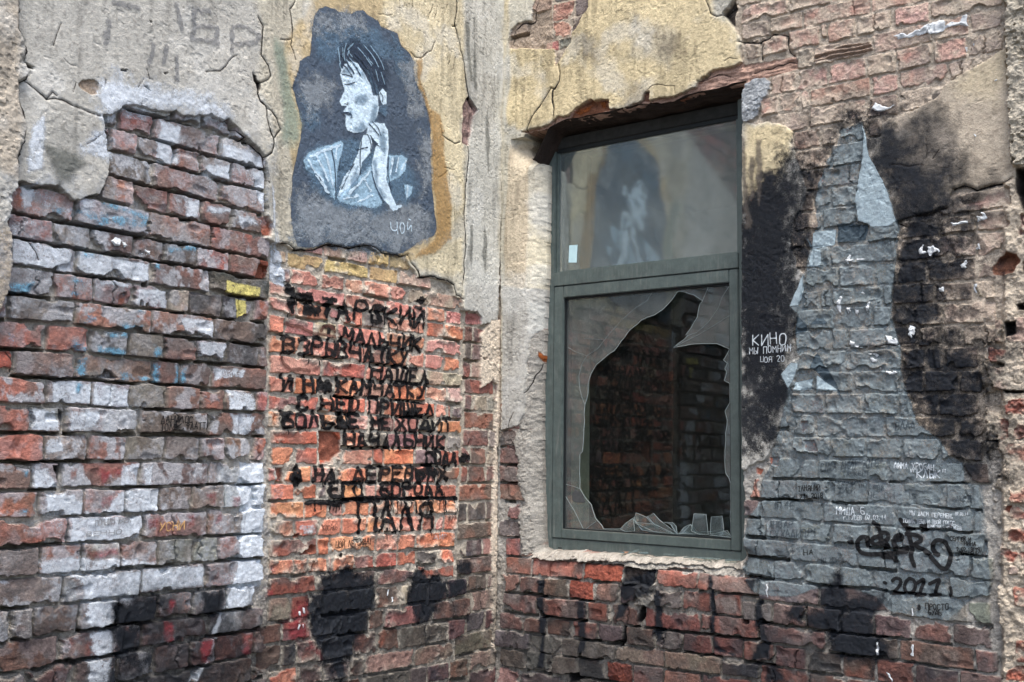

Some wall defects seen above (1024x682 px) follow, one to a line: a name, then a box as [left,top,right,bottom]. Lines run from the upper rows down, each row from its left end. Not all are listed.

spalling [509,0,553,49]
peeling [894,14,969,39]
spalling [814,42,874,61]
crack [18,8,100,161]
crack [526,65,560,132]
spalling [257,215,273,236]
spalling [251,262,268,279]
spalling [96,368,118,379]